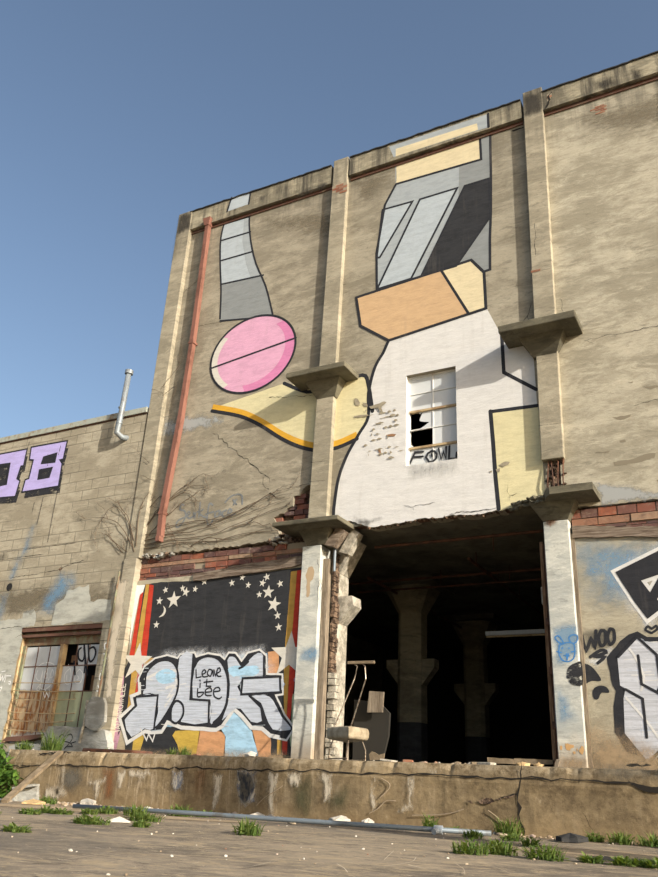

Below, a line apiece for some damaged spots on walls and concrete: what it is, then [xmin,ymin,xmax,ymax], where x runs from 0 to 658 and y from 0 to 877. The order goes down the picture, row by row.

peeling [354,398,402,459]
spalling [267,489,310,548]
crack [12,750,658,834]